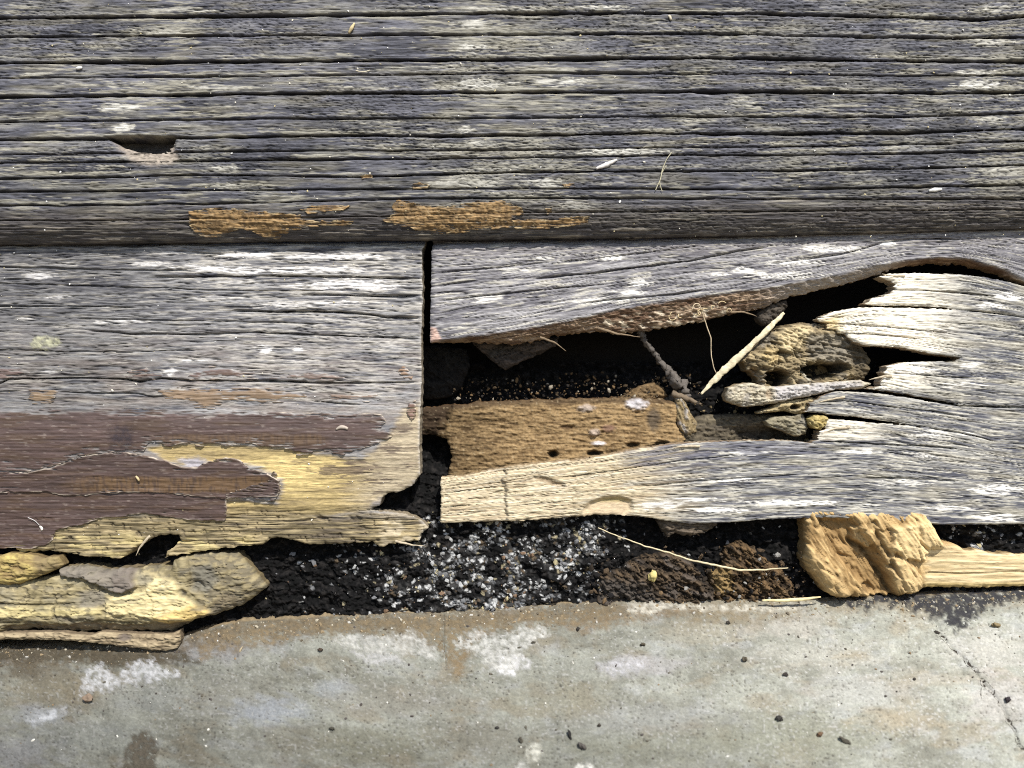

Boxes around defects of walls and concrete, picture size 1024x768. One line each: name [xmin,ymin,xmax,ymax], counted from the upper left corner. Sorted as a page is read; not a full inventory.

peeling [188,205,353,239]
peeling [383,182,589,234]
peeling [406,400,416,421]
crack [835,374,1011,449]
peeling [0,366,395,549]